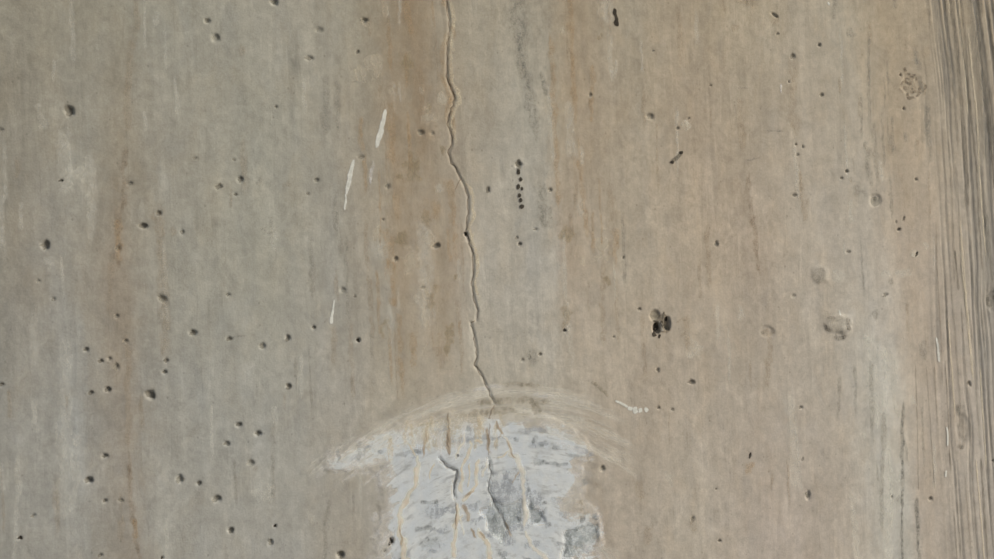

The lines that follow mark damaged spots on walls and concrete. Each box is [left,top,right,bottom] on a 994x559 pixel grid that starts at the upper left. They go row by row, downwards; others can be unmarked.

crack [446,1,506,527]
crack [440,415,459,525]
peeling [330,414,611,559]